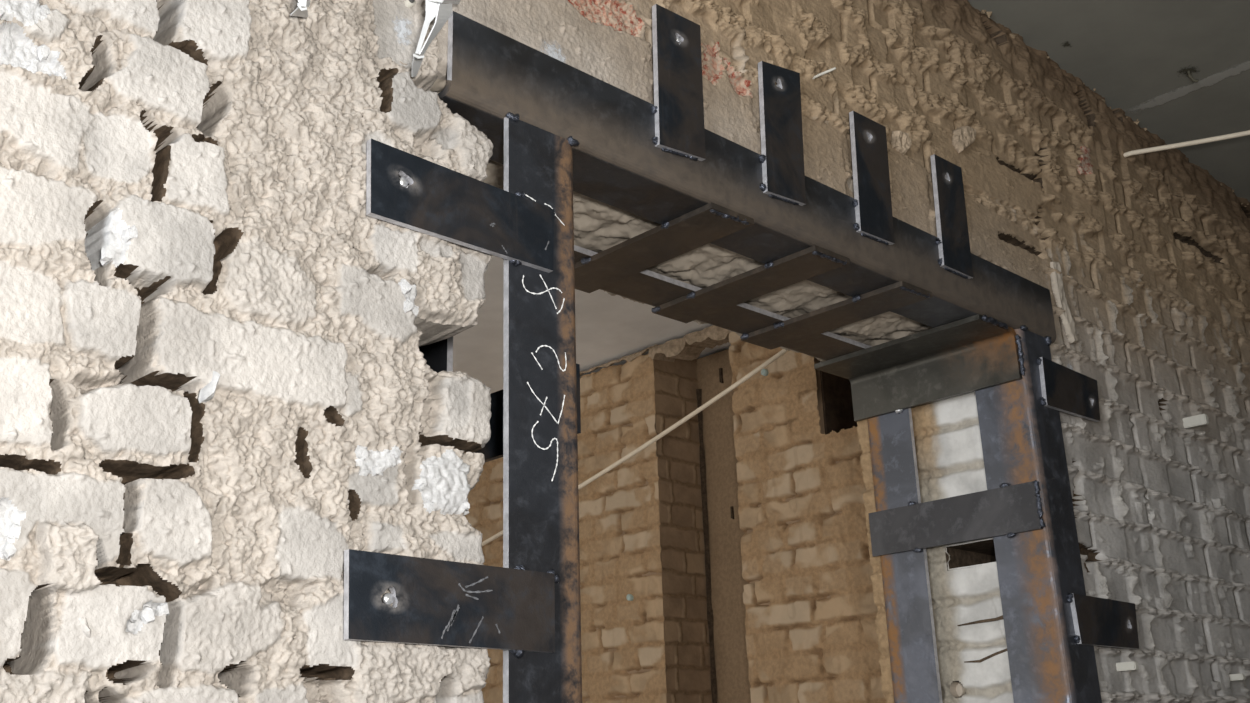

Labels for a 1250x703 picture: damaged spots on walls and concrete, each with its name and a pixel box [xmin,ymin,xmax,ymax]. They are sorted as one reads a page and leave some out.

spalling [568,0,645,37]
spalling [0,0,68,79]
spalling [84,208,138,271]
crack [1173,232,1224,264]
spalling [398,279,419,318]
spalling [198,371,220,404]
spalling [355,445,403,476]
spalling [412,449,470,516]
spalling [0,497,27,561]
spalling [126,600,169,634]